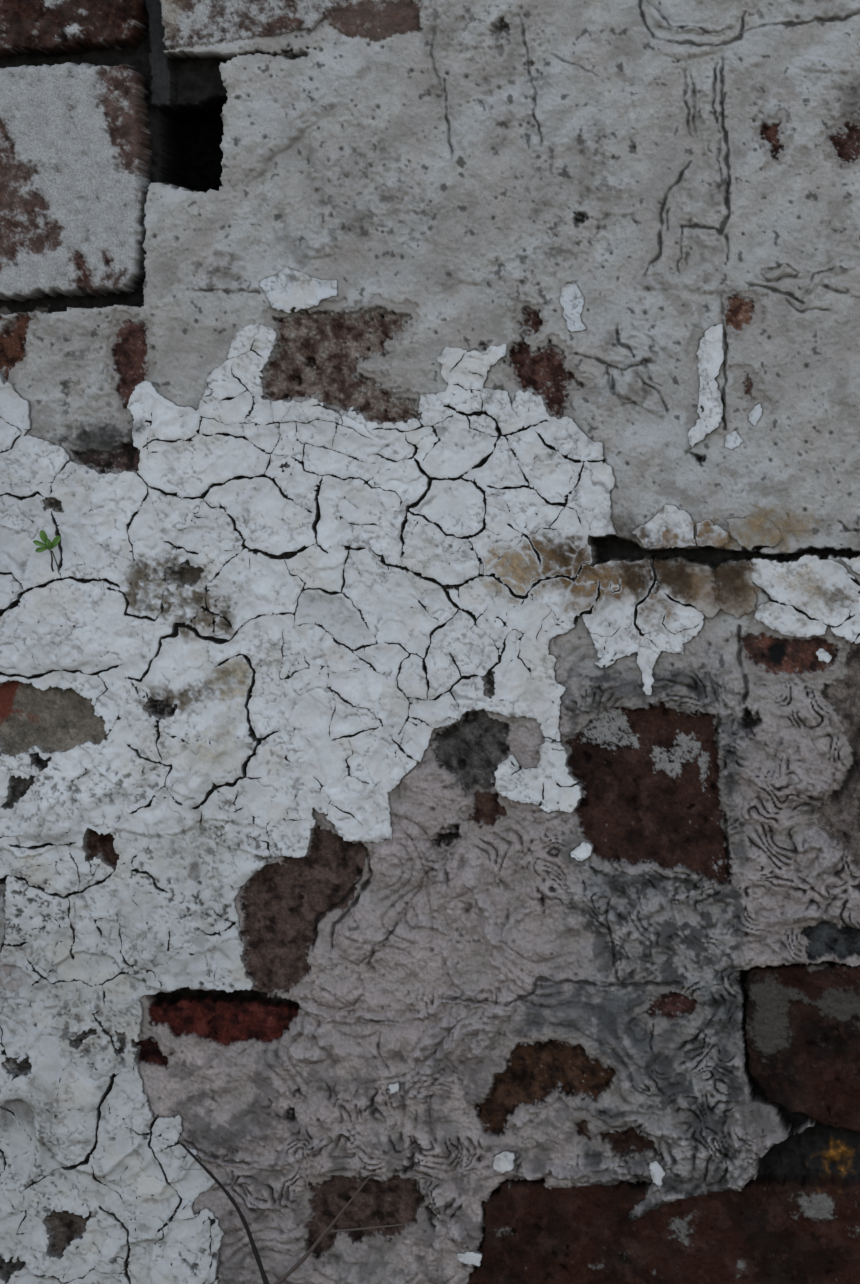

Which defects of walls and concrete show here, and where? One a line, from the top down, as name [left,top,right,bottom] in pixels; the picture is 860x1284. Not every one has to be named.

spalling [490,17,510,39]
crack [638,0,860,433]
crack [571,325,669,415]
crack [0,348,706,848]
crack [753,577,860,643]
crack [714,626,750,752]
peeling [0,267,860,1284]
crack [0,836,165,1107]
crack [311,846,374,952]
crack [438,898,699,1010]
crack [0,1109,97,1221]
crack [121,1245,131,1284]